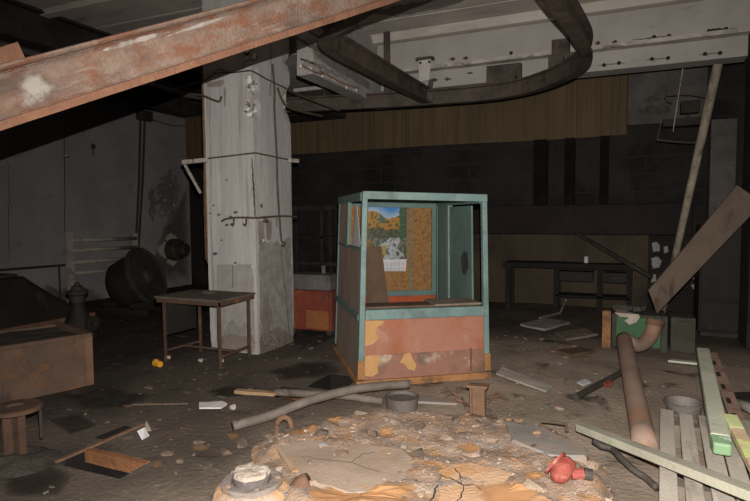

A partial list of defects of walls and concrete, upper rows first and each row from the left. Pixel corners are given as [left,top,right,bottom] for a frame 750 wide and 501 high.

spalling [245,74,258,117]